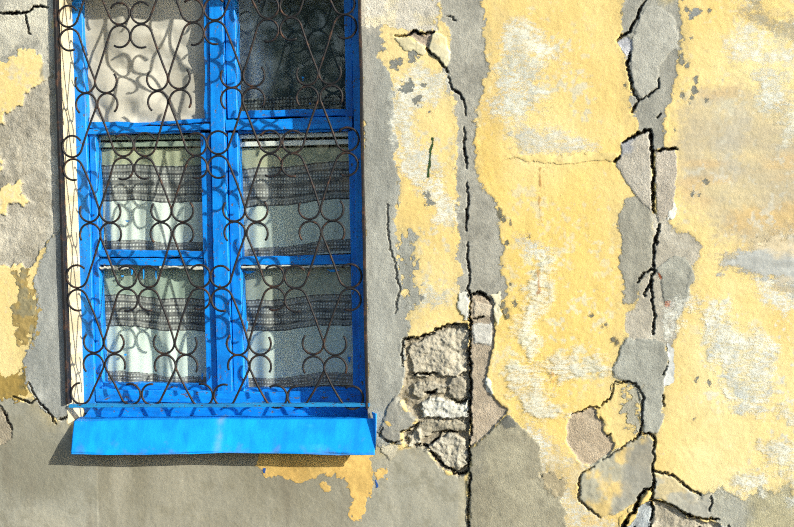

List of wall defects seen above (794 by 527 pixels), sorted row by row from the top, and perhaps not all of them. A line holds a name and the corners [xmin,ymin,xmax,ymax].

crack [1,5,48,32]
peeling [618,37,633,65]
crack [618,2,659,111]
spalling [679,75,708,105]
spalling [684,0,712,20]
spalling [0,0,60,349]
crack [379,30,489,527]
crack [614,115,676,334]
crack [0,384,67,429]
spalling [373,228,726,527]
crack [576,381,729,527]
peeling [733,469,767,498]